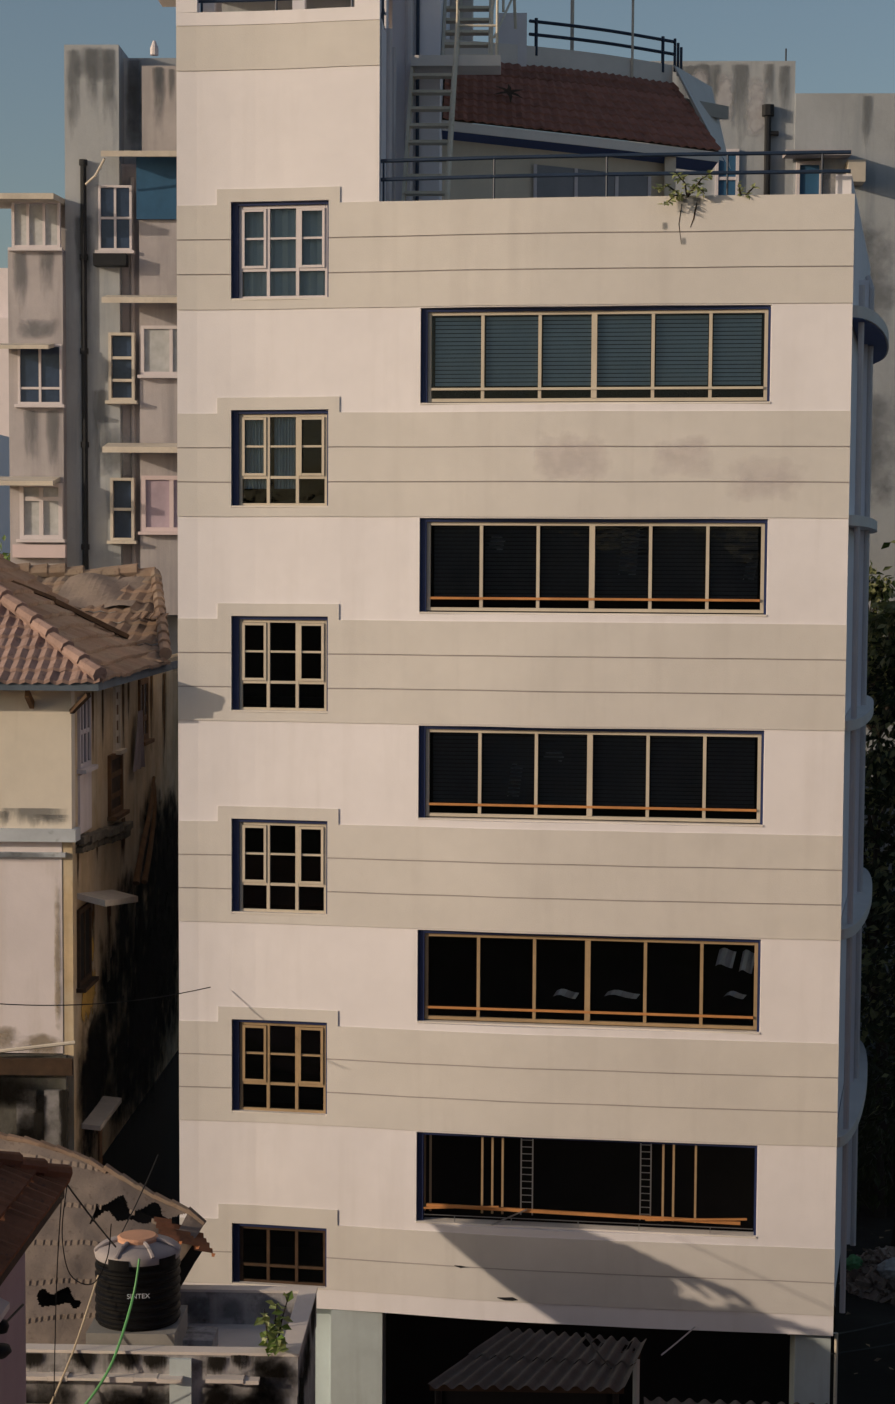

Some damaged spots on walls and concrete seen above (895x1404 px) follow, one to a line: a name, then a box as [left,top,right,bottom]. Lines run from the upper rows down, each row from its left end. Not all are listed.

damp [694,71,732,116]
damp [748,84,765,132]
damp [823,175,836,194]
damp [92,690,104,741]
damp [150,672,167,760]
damp [0,794,179,1158]
damp [26,1353,43,1368]
damp [70,1353,167,1371]
damp [202,1297,316,1404]
damp [26,1388,71,1404]
damp [97,1390,164,1404]